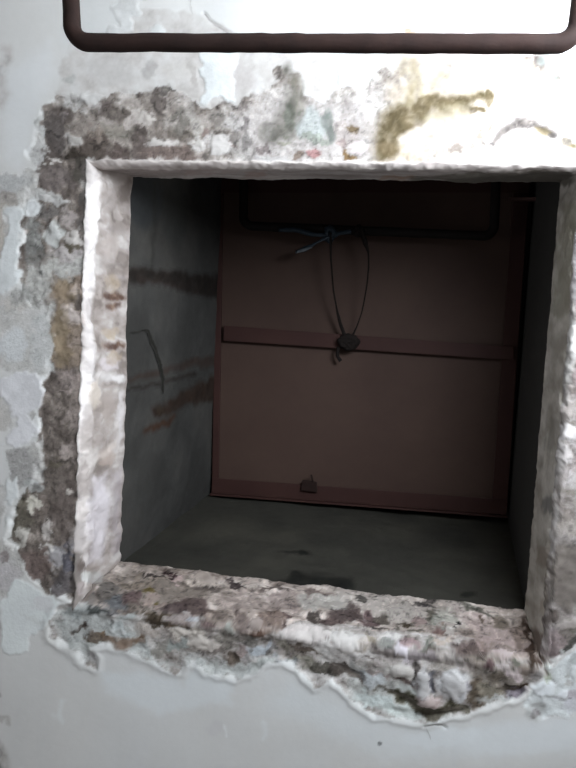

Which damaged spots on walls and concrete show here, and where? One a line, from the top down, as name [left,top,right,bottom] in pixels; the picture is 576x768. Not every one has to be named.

damp [91,0,236,34]
peeling [392,3,488,33]
peeling [402,54,537,65]
damp [54,41,576,164]
flaking render [431,127,576,166]
flaking render [0,61,396,598]
spalling [48,229,576,726]
crack [0,692,13,768]